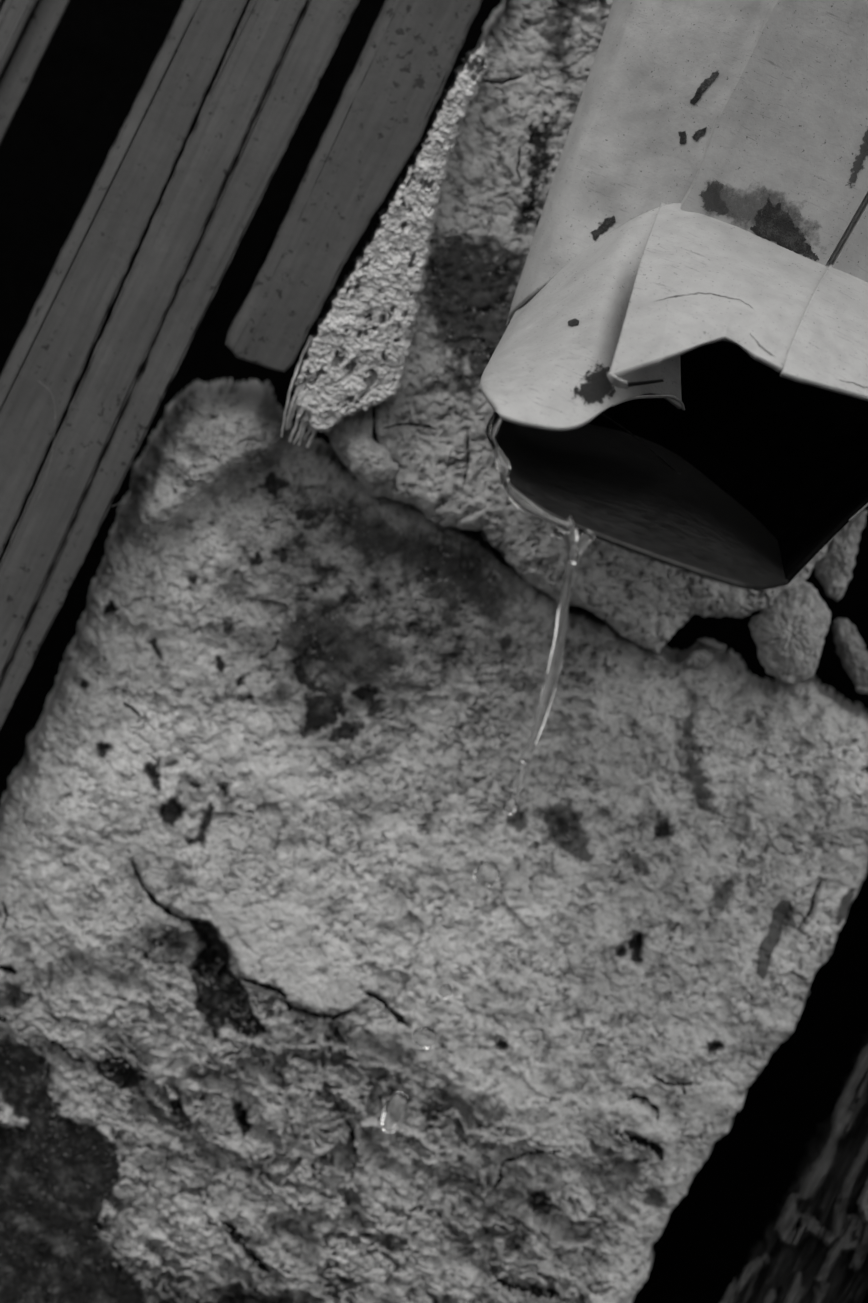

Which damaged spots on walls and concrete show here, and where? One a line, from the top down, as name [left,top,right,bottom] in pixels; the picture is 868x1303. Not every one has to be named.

crack [131,861,188,920]
crack [240,977,408,1026]